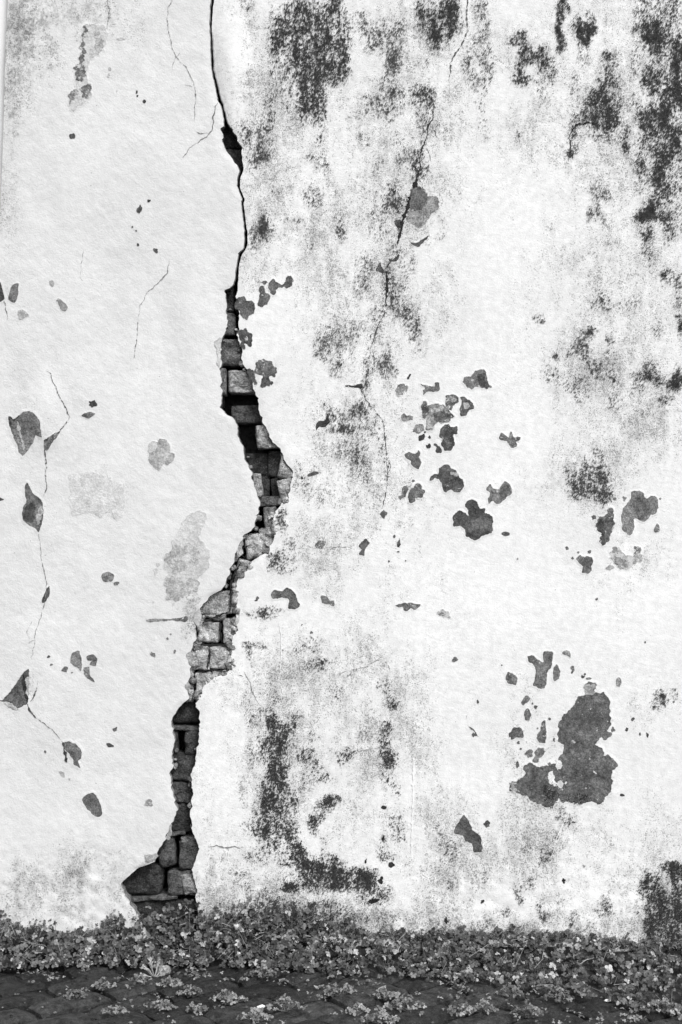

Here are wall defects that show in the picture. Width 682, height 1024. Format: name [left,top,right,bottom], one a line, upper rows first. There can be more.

crack [167,3,243,177]
peeling [146,0,319,653]
water stain [241,0,495,492]
crack [361,103,437,507]
crack [448,0,468,81]
water stain [506,0,682,337]
crack [123,287,293,930]
water stain [226,675,406,928]
peeling [393,367,514,543]
spalling [501,649,649,810]
peeling [565,488,662,576]
water stain [615,860,682,952]